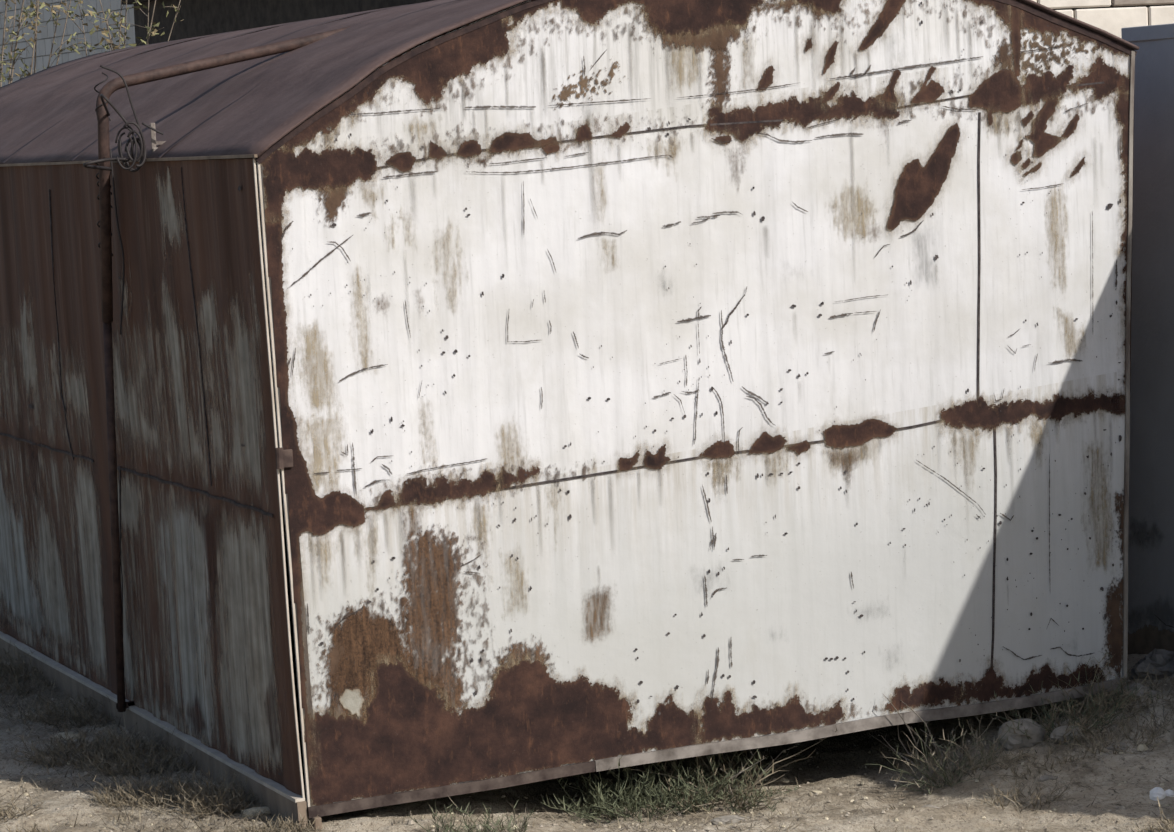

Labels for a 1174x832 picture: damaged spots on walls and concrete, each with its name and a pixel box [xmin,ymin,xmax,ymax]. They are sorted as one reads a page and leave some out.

corrosion [261,0,1130,806]
corrosion [194,510,219,612]
peeling [339,688,364,716]